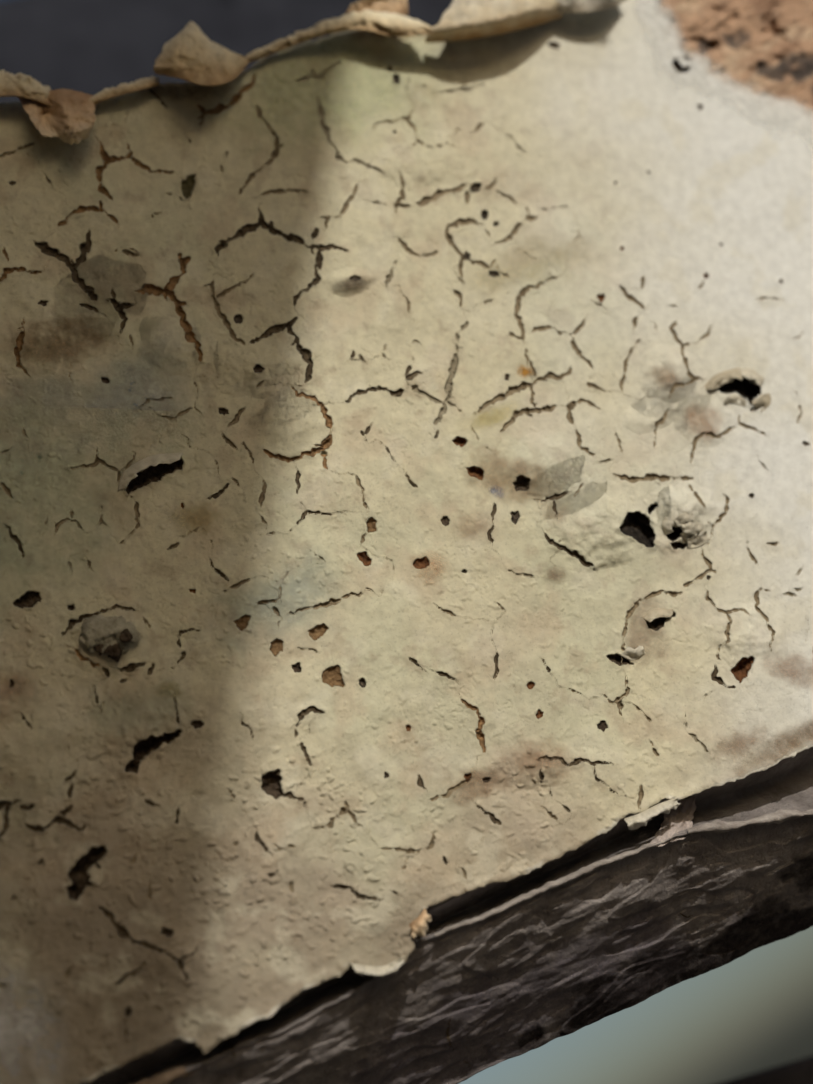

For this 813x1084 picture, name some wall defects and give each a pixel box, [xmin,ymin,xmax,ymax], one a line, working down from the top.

peeling [0,0,626,145]
spalling [658,0,813,115]
peeling [181,175,195,199]
crack [0,62,810,756]
crack [0,745,90,866]
crack [143,796,185,823]
crack [229,706,469,901]
crack [409,657,502,825]
crack [533,755,644,825]
peeling [624,797,680,830]
crack [99,906,199,1041]
water stain [357,905,813,1084]